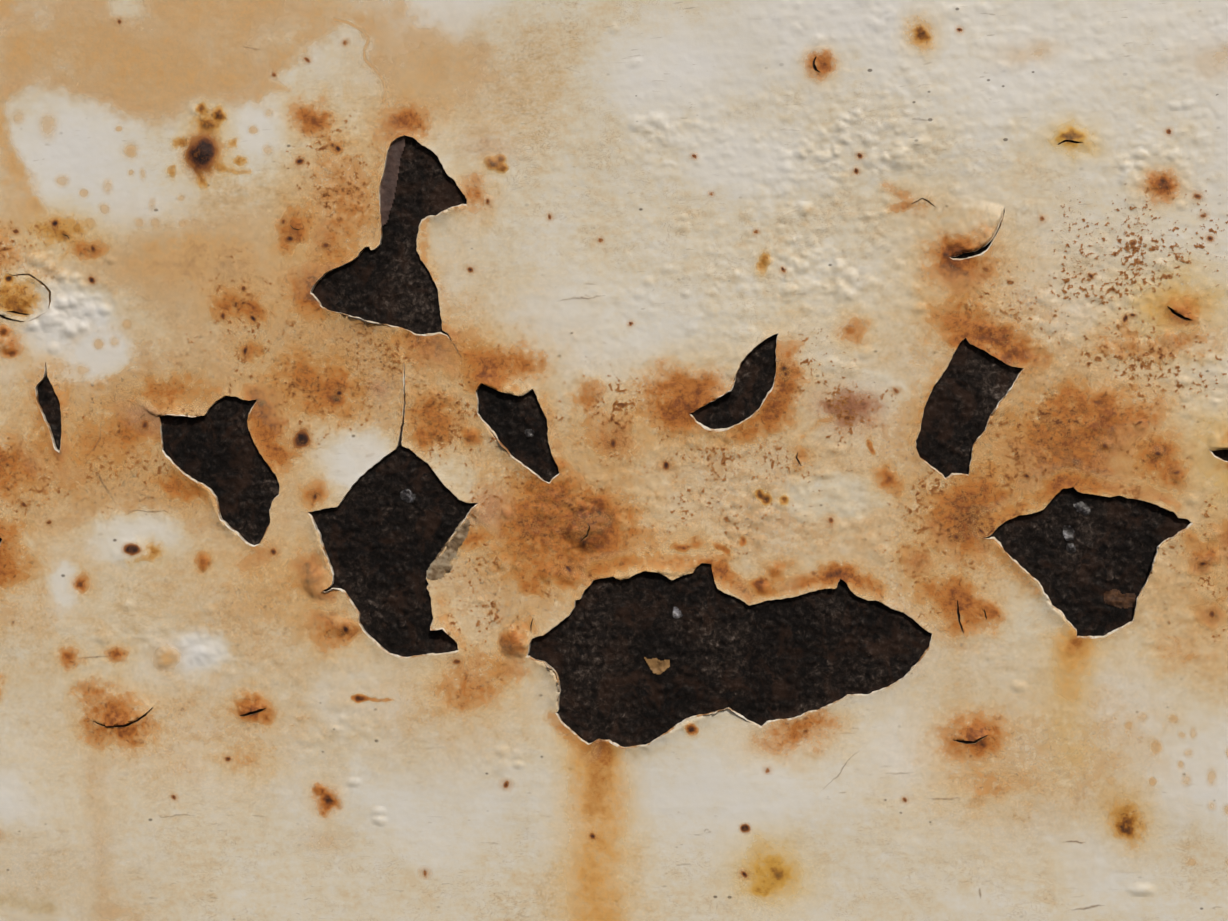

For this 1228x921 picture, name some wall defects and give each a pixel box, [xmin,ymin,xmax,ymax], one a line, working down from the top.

leakage [0,0,485,238]
peeling [310,135,467,341]
corrosion [76,680,160,749]
peeling [158,396,280,547]
corrosion [233,693,275,725]
corrosion [0,98,546,625]
peeling [307,363,478,658]
corrosion [549,714,626,921]
peeling [526,563,932,749]
corrosion [419,171,1228,716]
peeling [916,338,1024,479]
peeling [983,487,1193,638]